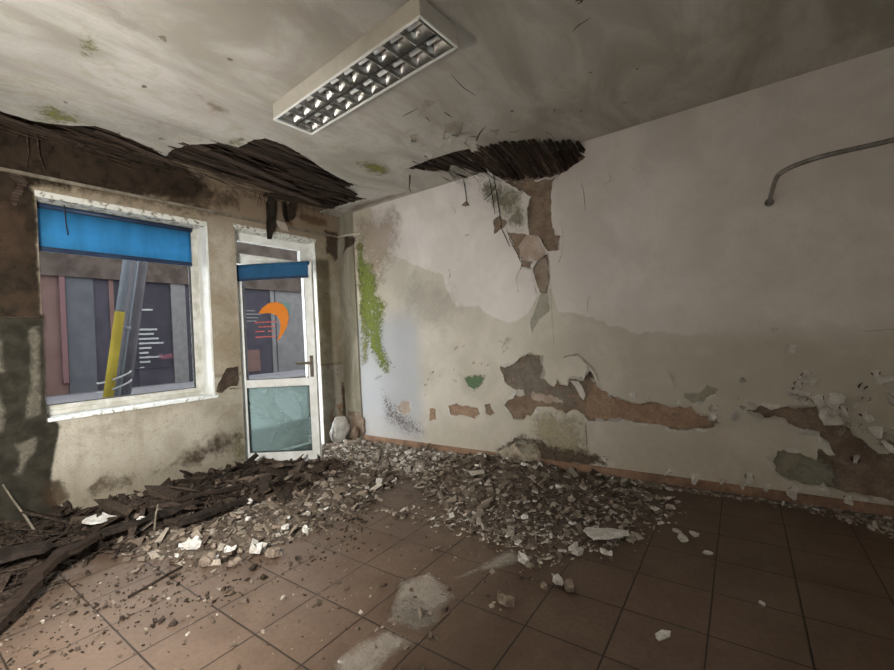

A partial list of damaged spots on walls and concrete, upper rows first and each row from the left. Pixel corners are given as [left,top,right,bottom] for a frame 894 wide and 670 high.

peeling [442,121,477,152]
flaking render [492,175,561,270]
damp [0,118,244,522]
flaking render [448,335,894,506]